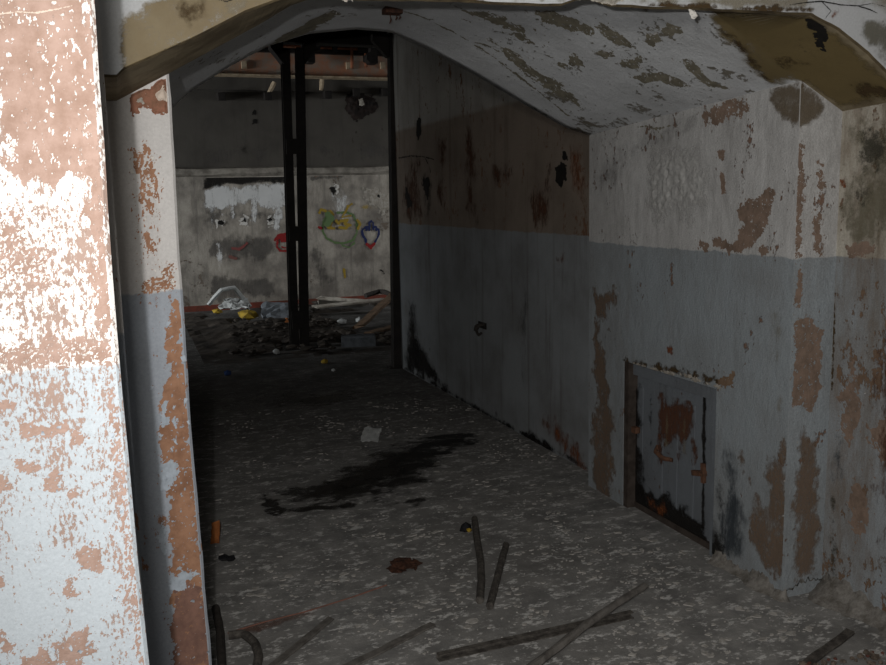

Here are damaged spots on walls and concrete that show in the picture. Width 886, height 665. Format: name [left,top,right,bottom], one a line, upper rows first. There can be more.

spalling [129,79,168,117]
leakage [120,0,272,67]
peeling [460,8,750,127]
leakage [650,0,886,126]
leakage [861,129,884,172]
peeling [0,0,144,665]
peeling [127,140,210,665]
peeling [590,284,619,497]
corrosion [650,393,697,463]
peeling [695,180,776,262]
peeling [790,141,827,412]
peeling [749,436,821,580]